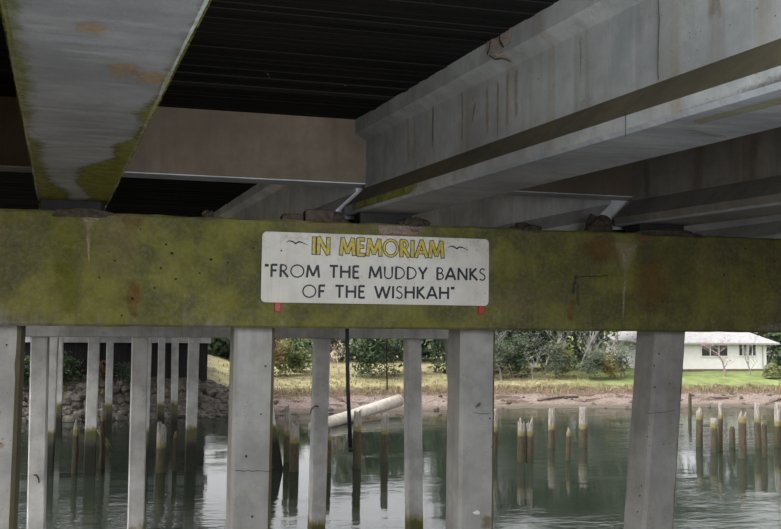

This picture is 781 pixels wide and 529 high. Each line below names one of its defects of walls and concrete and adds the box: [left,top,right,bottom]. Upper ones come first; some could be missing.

spalling [486,28,512,62]